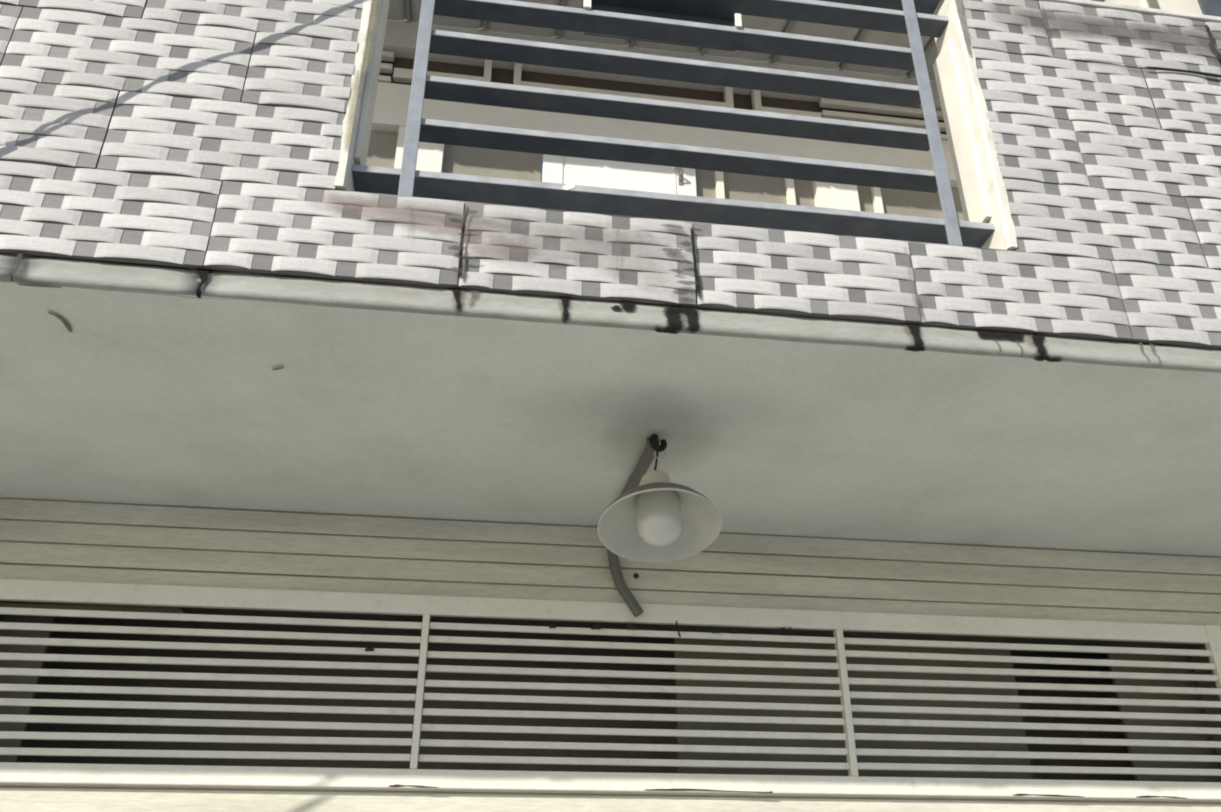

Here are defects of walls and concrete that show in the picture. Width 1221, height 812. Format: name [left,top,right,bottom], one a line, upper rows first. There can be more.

crack [1091,25,1221,78]
leakage [654,224,702,334]
leakage [905,323,925,352]
leakage [977,330,1062,362]